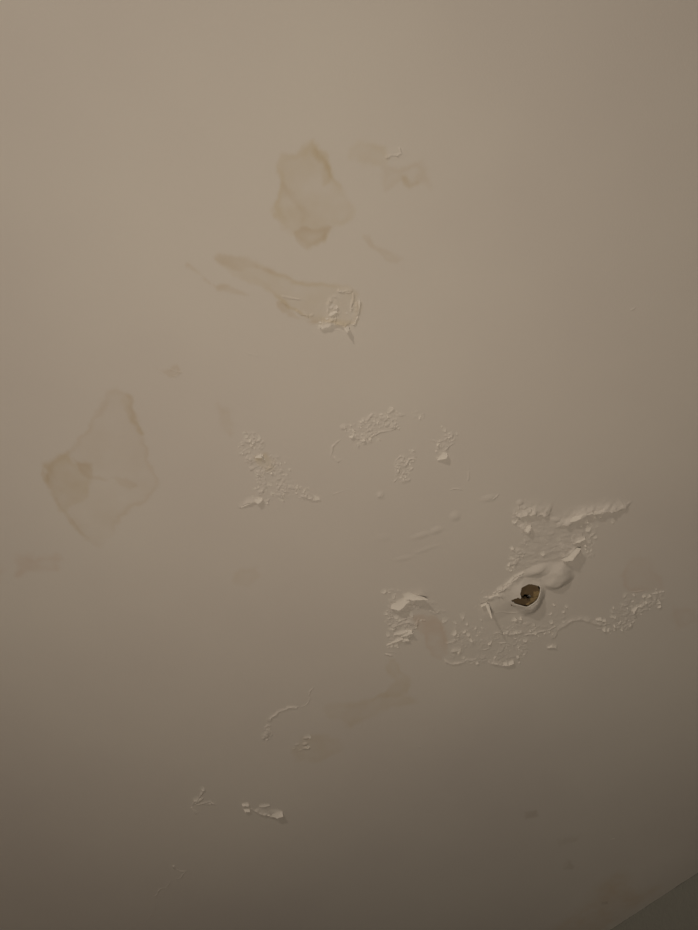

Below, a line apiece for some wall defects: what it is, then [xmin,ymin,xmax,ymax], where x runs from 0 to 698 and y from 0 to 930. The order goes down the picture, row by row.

water stain [267,135,359,254]
water stain [38,384,163,549]
peeling [505,495,633,572]
peeling [379,588,449,657]
flaking render [511,584,541,608]